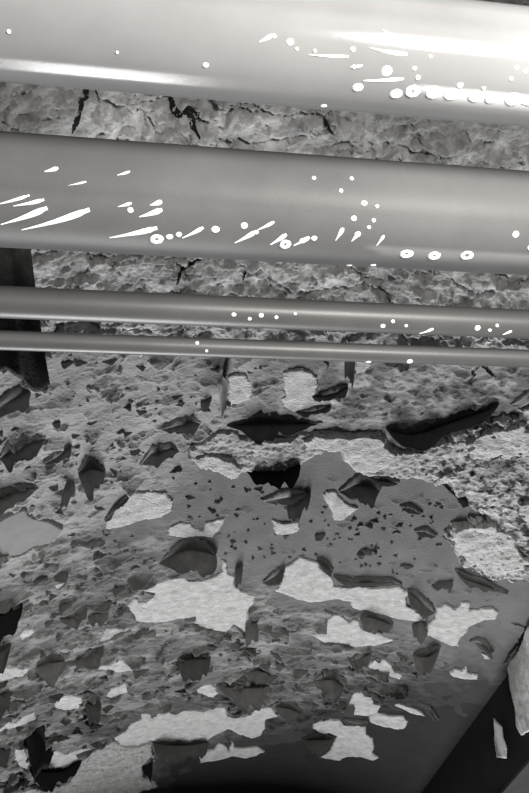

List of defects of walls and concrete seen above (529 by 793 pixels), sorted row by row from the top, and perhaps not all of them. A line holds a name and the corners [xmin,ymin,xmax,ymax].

spalling [0,82,529,171]
spalling [0,247,529,310]
peeling [0,350,56,418]
peeling [61,354,87,369]
spalling [0,318,529,350]
peeling [509,389,529,407]
flaking render [0,362,508,793]
peeling [507,626,529,735]